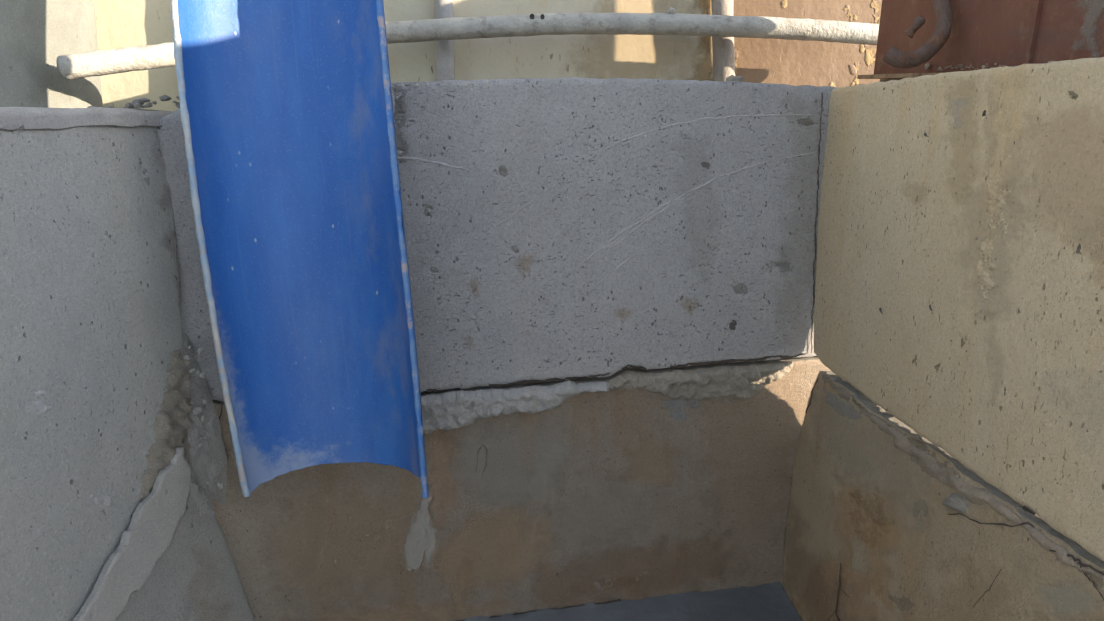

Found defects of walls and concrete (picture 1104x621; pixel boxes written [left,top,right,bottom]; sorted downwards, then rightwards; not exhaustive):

peeling [849,44,876,86]
crack [489,93,823,387]
crack [423,386,460,394]
leakage [405,496,435,569]
crack [948,506,1036,528]
crack [828,563,849,621]
crack [1050,550,1104,600]